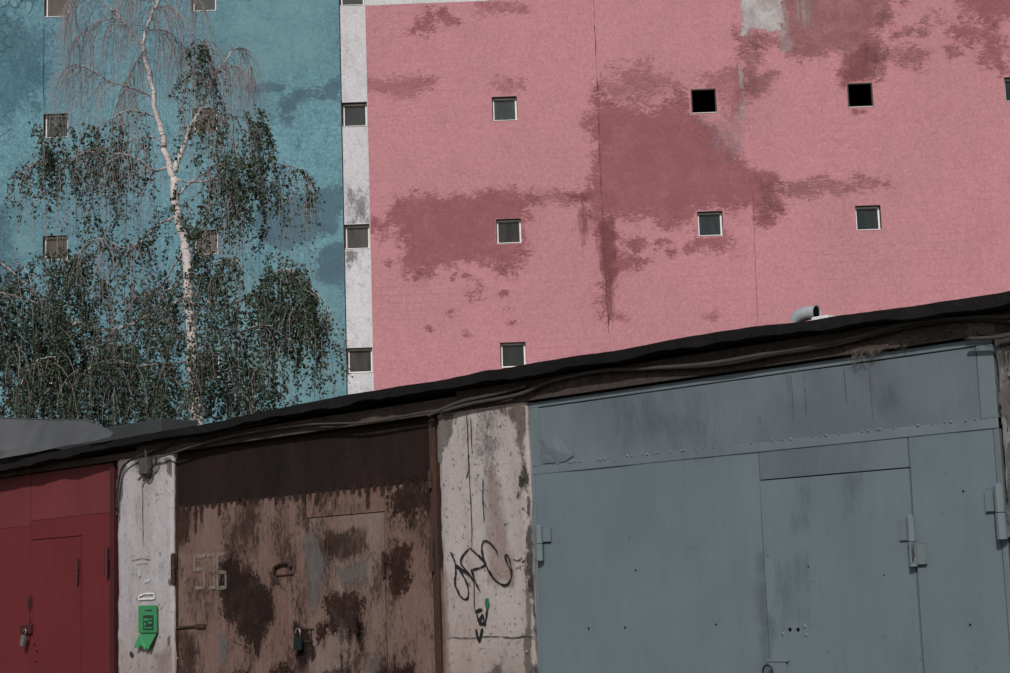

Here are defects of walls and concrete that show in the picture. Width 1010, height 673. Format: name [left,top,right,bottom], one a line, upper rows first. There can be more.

crack [0,0,34,15]
peeling [731,0,1010,98]
leakage [599,218,617,320]
rust [178,505,193,545]
rust [324,525,372,561]
rust [380,469,441,602]
rust [178,629,201,673]
rust [215,552,282,673]
rust [267,586,368,673]
rust [375,660,417,673]